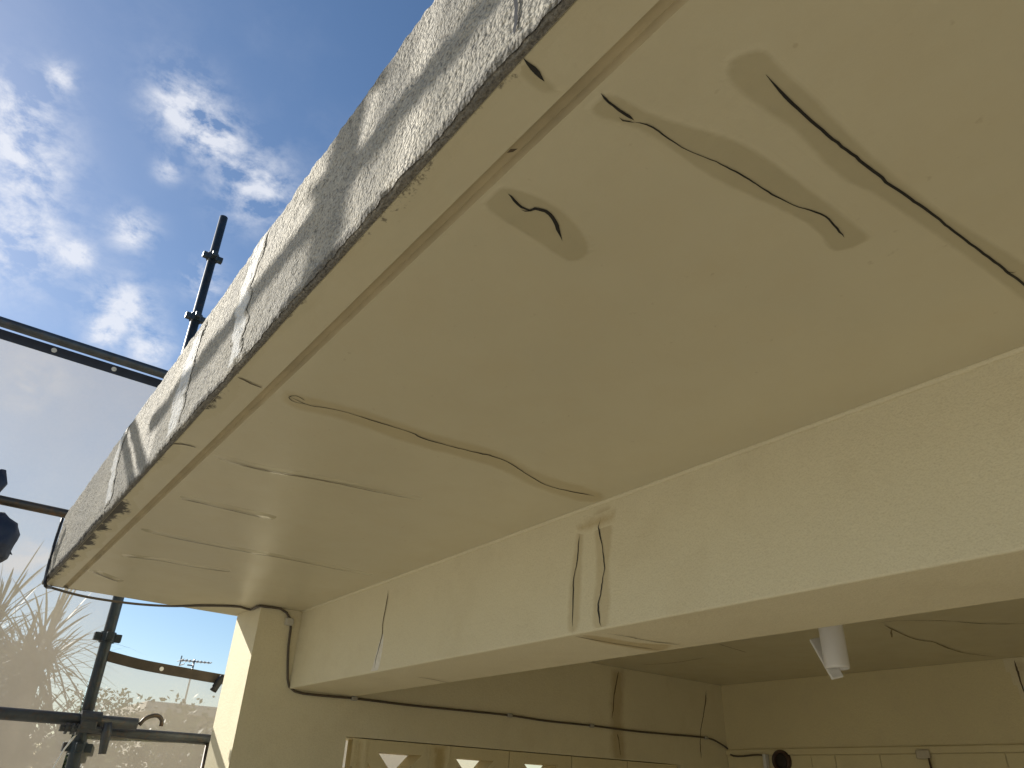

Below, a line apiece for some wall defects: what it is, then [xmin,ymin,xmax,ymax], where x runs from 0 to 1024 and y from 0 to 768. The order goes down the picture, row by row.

leakage [42,0,593,584]
crack [474,178,600,267]
crack [517,37,1024,308]
crack [370,595,388,672]
crack [240,378,676,645]